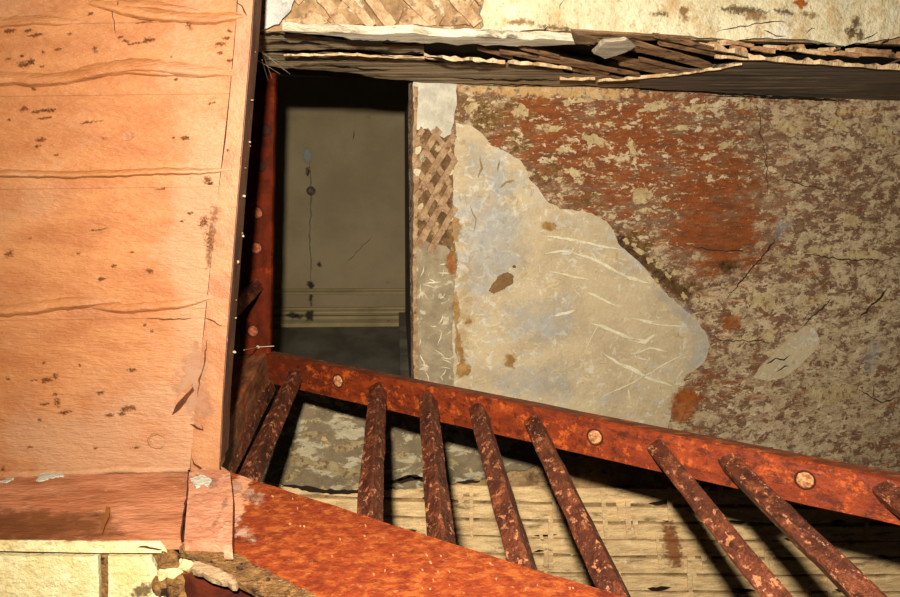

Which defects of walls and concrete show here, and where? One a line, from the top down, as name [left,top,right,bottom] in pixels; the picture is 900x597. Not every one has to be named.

crack [259,32,557,82]
peeling [684,103,715,113]
peeling [716,139,735,150]
crack [701,92,849,192]
peeling [410,86,710,428]
crack [693,227,784,299]
crack [812,254,888,266]
crack [860,289,887,317]
crack [148,318,221,394]
corrosion [671,389,698,422]